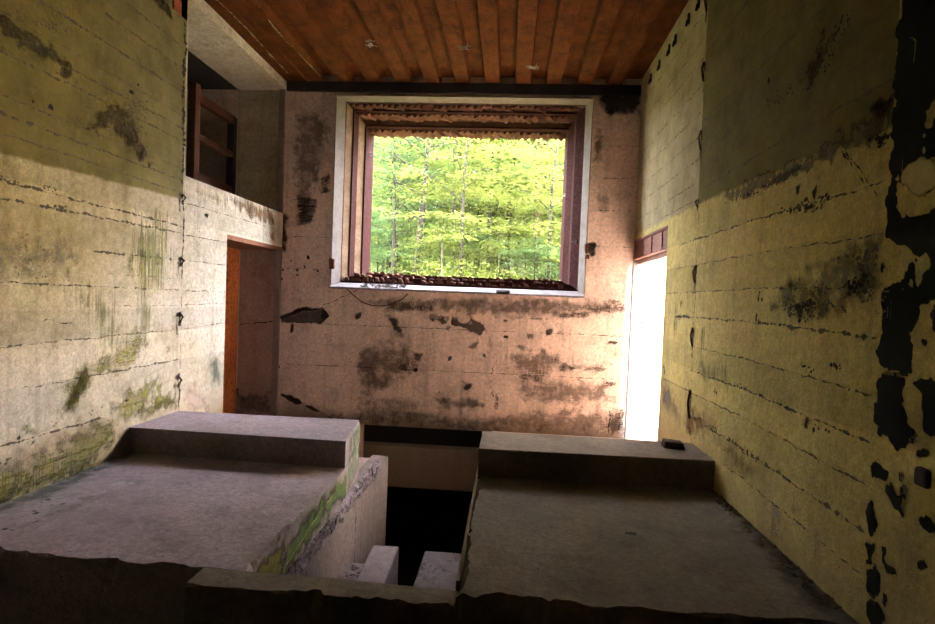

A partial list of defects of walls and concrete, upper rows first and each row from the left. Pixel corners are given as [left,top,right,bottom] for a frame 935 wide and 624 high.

peeling [725,0,935,457]
spalling [280,307,329,333]
water stain [355,299,624,435]
peeling [865,489,897,624]
peeling [870,461,908,518]
peeling [919,515,935,534]